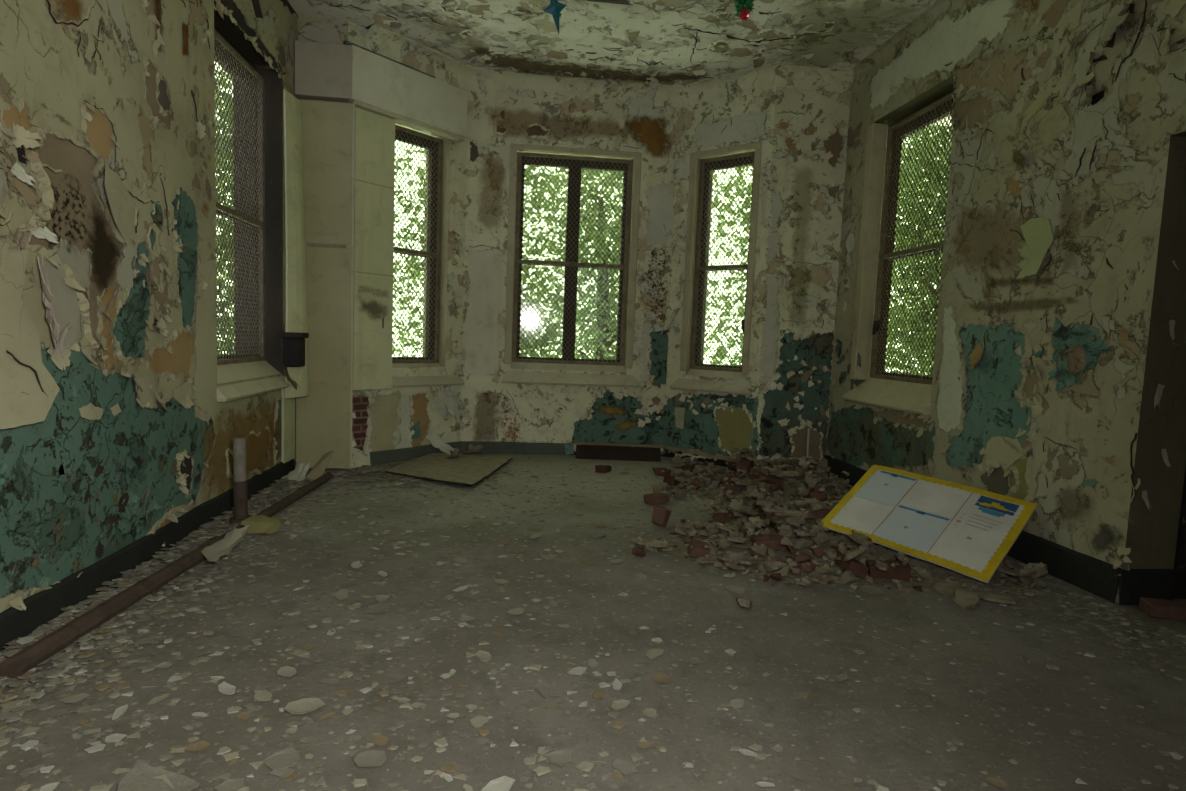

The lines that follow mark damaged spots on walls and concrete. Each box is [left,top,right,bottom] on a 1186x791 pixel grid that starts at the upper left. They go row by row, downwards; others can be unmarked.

crack [46,0,104,60]
crack [163,0,210,49]
peeling [199,0,290,82]
peeling [327,0,616,79]
peeling [621,0,837,89]
peeling [868,0,1038,139]
crack [1114,0,1186,86]
crack [944,0,1108,275]
crack [0,98,186,313]
peeling [1016,218,1054,279]
peeling [0,23,283,610]
flaking render [352,389,432,454]